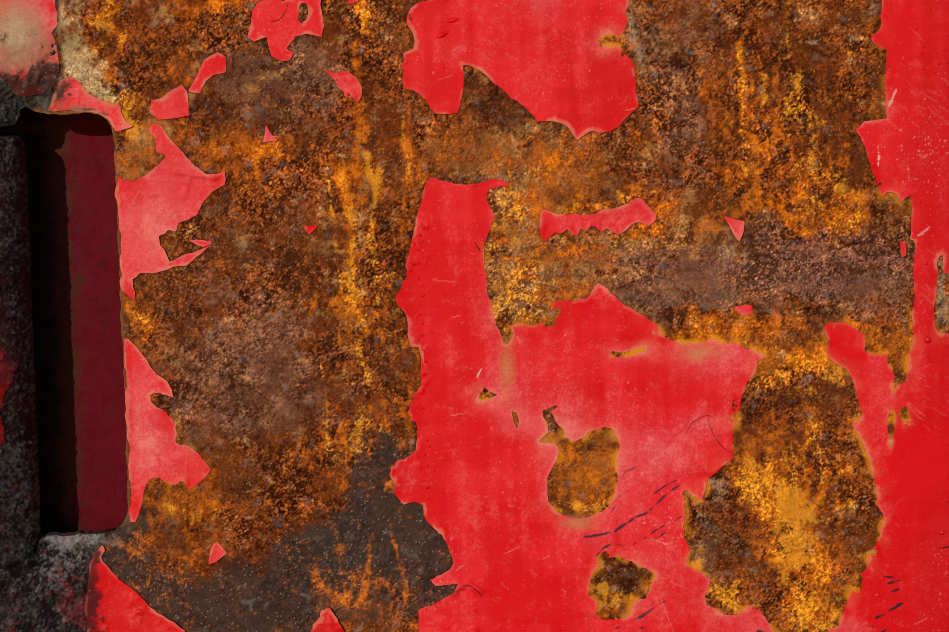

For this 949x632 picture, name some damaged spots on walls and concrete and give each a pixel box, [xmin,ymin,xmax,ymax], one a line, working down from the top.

peeling [298,3,308,23]
corrosion [52,0,491,579]
peeling [610,342,645,357]
corrosion [474,0,915,632]
peeling [934,255,949,333]
peeling [85,545,185,632]
peeling [311,607,345,632]
corrosion [343,617,419,632]